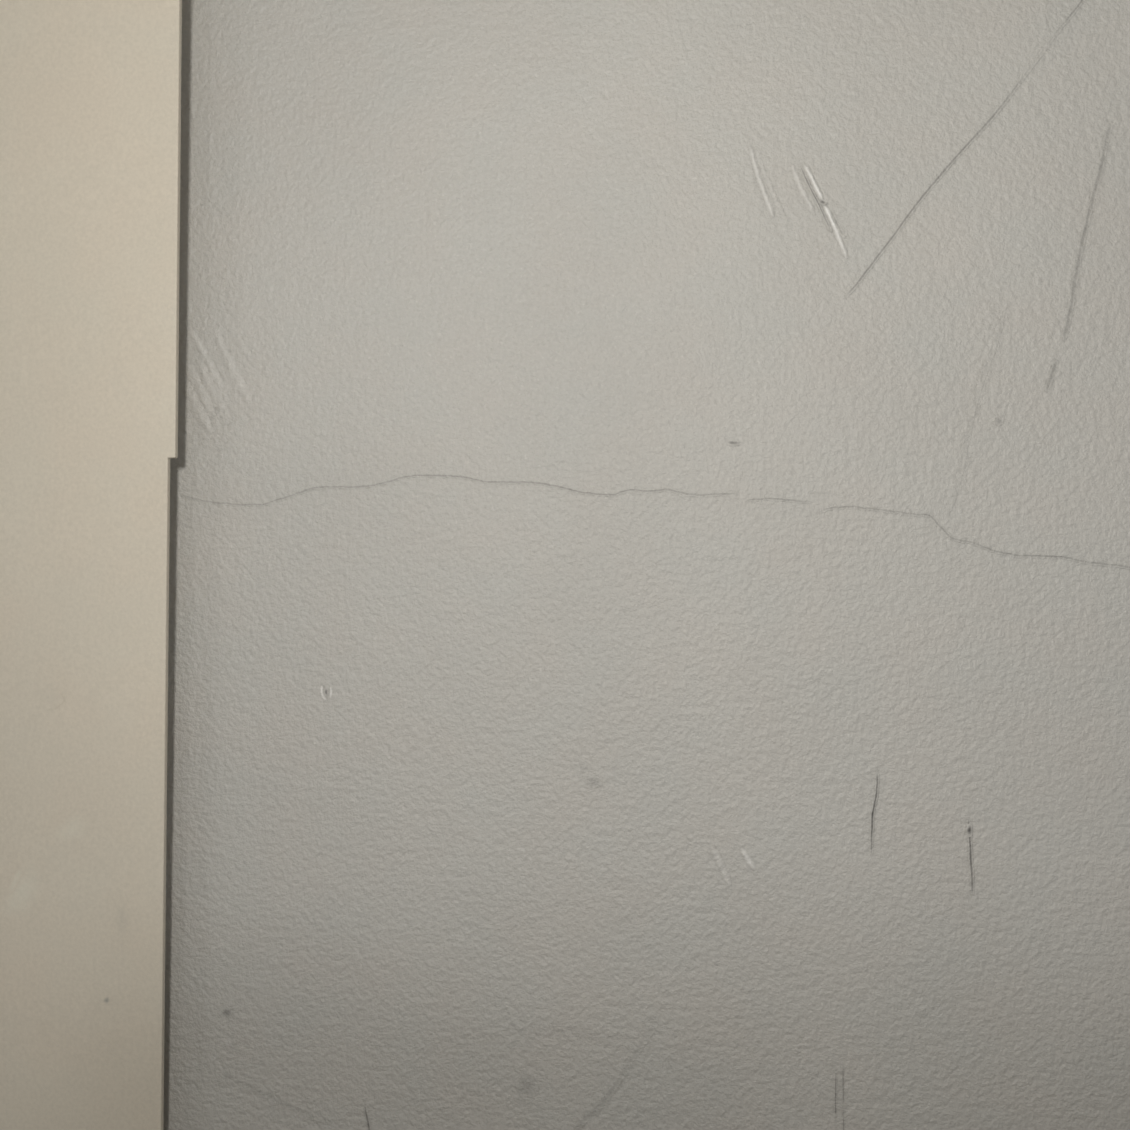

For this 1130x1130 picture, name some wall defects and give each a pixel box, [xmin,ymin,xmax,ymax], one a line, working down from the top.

crack [844,0,1085,299]
crack [1045,119,1113,392]
crack [179,473,1130,570]